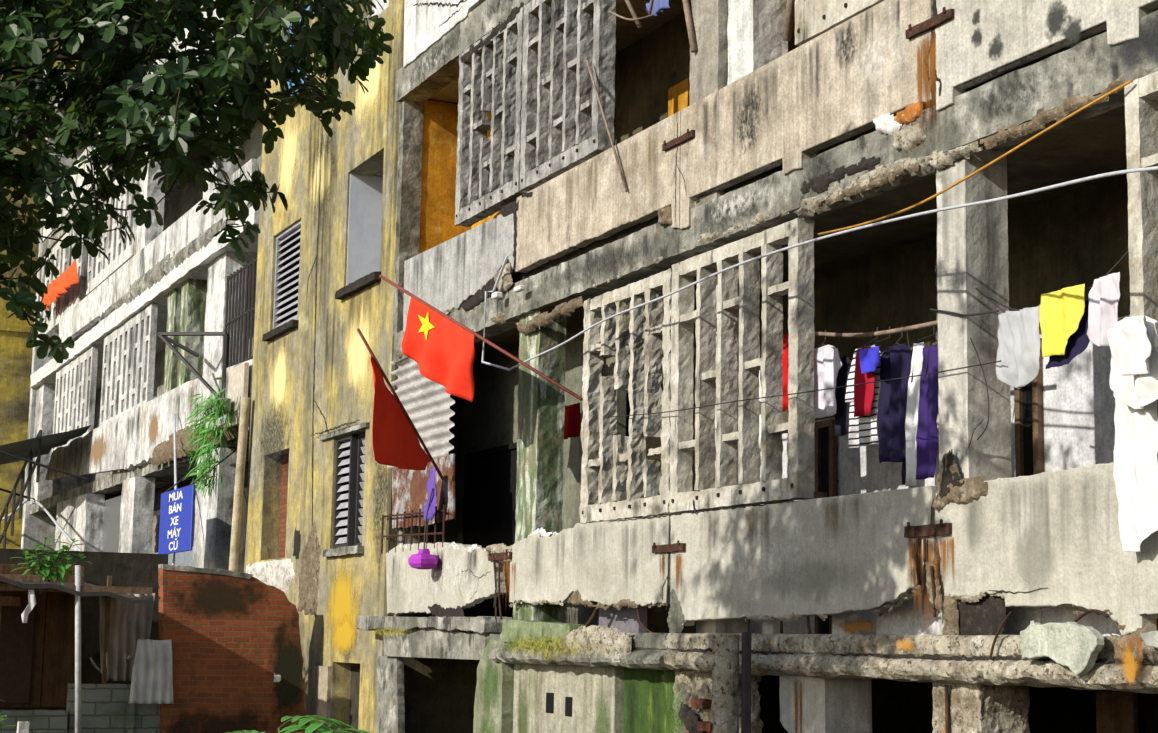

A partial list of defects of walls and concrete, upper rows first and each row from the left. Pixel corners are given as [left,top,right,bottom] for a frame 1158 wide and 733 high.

water stain [1048,2,1081,45]
rust [917,37,936,117]
spalling [682,76,1125,249]
spalling [246,522,322,619]
rust [662,555,681,584]
spalling [745,612,828,634]
rust [908,538,954,598]
spalling [875,538,1012,659]
flaking render [1020,609,1149,676]
rust [1121,639,1142,682]
spalling [678,698,713,733]